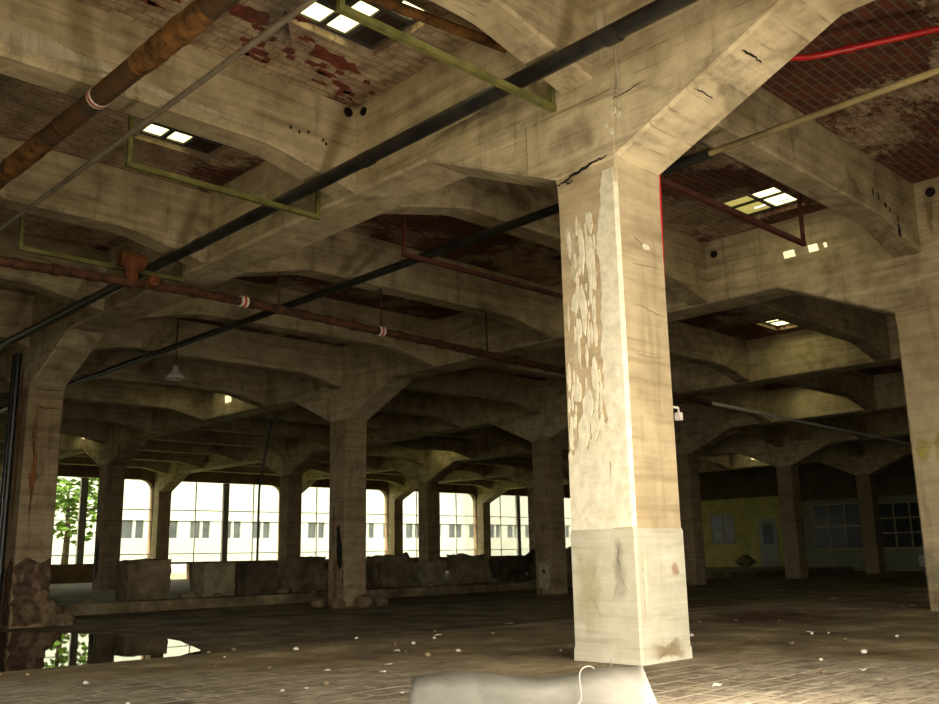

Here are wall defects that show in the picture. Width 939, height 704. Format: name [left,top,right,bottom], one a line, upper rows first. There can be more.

peeling [139,0,181,9]
peeling [228,3,375,97]
crack [554,154,607,187]
peeling [565,167,637,531]
rust [29,425,37,510]
spalling [1,557,78,628]